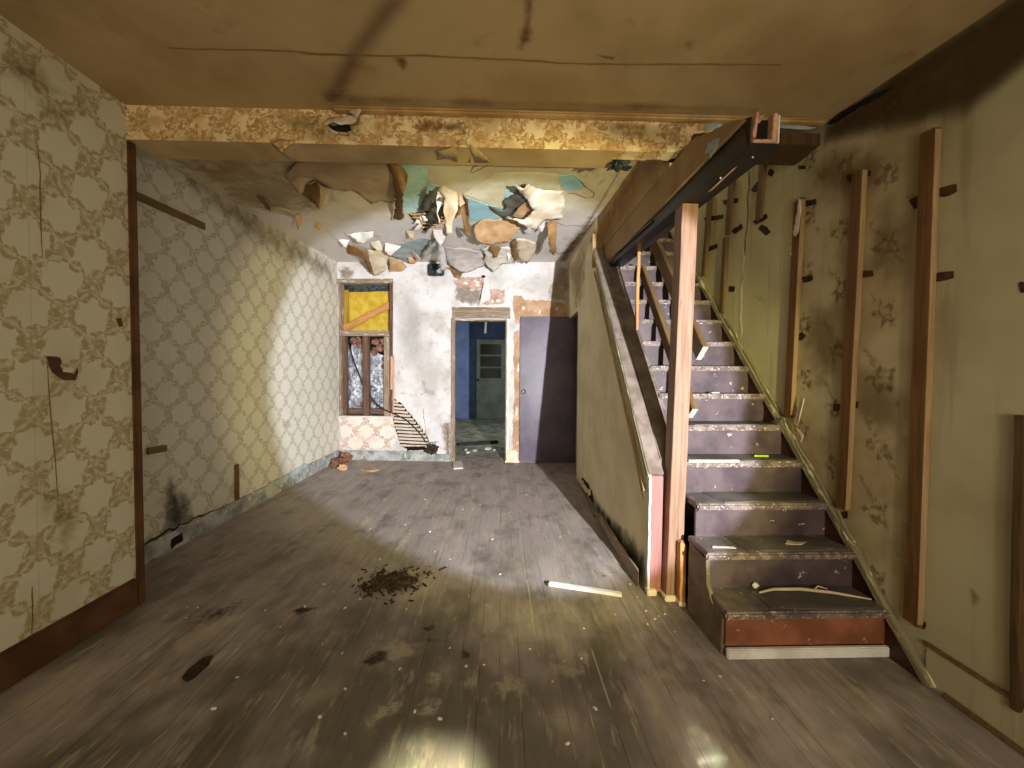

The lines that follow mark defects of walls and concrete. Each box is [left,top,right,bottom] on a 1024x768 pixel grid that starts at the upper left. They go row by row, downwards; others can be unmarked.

crack [36,150,44,257]
flaking render [398,164,438,213]
flaking render [464,173,584,221]
flaking render [388,238,444,262]
flaking render [454,275,568,460]
mould [166,485,191,527]